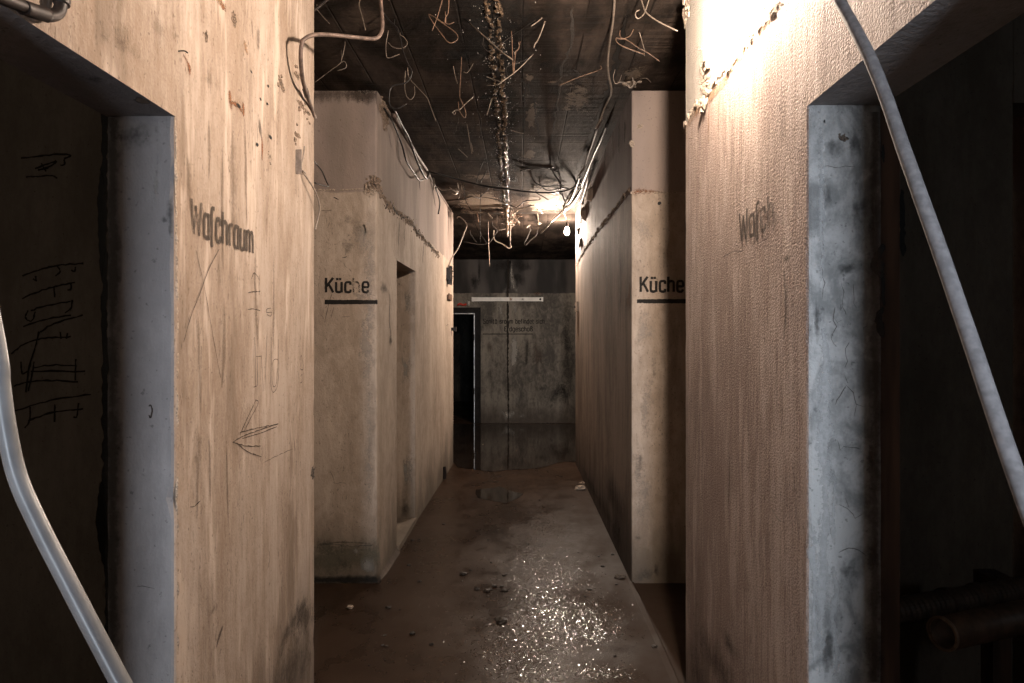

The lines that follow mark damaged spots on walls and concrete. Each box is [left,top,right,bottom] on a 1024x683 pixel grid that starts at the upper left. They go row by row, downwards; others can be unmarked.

peeling [684,48,724,128]
spalling [363,175,439,257]
crack [821,221,861,415]